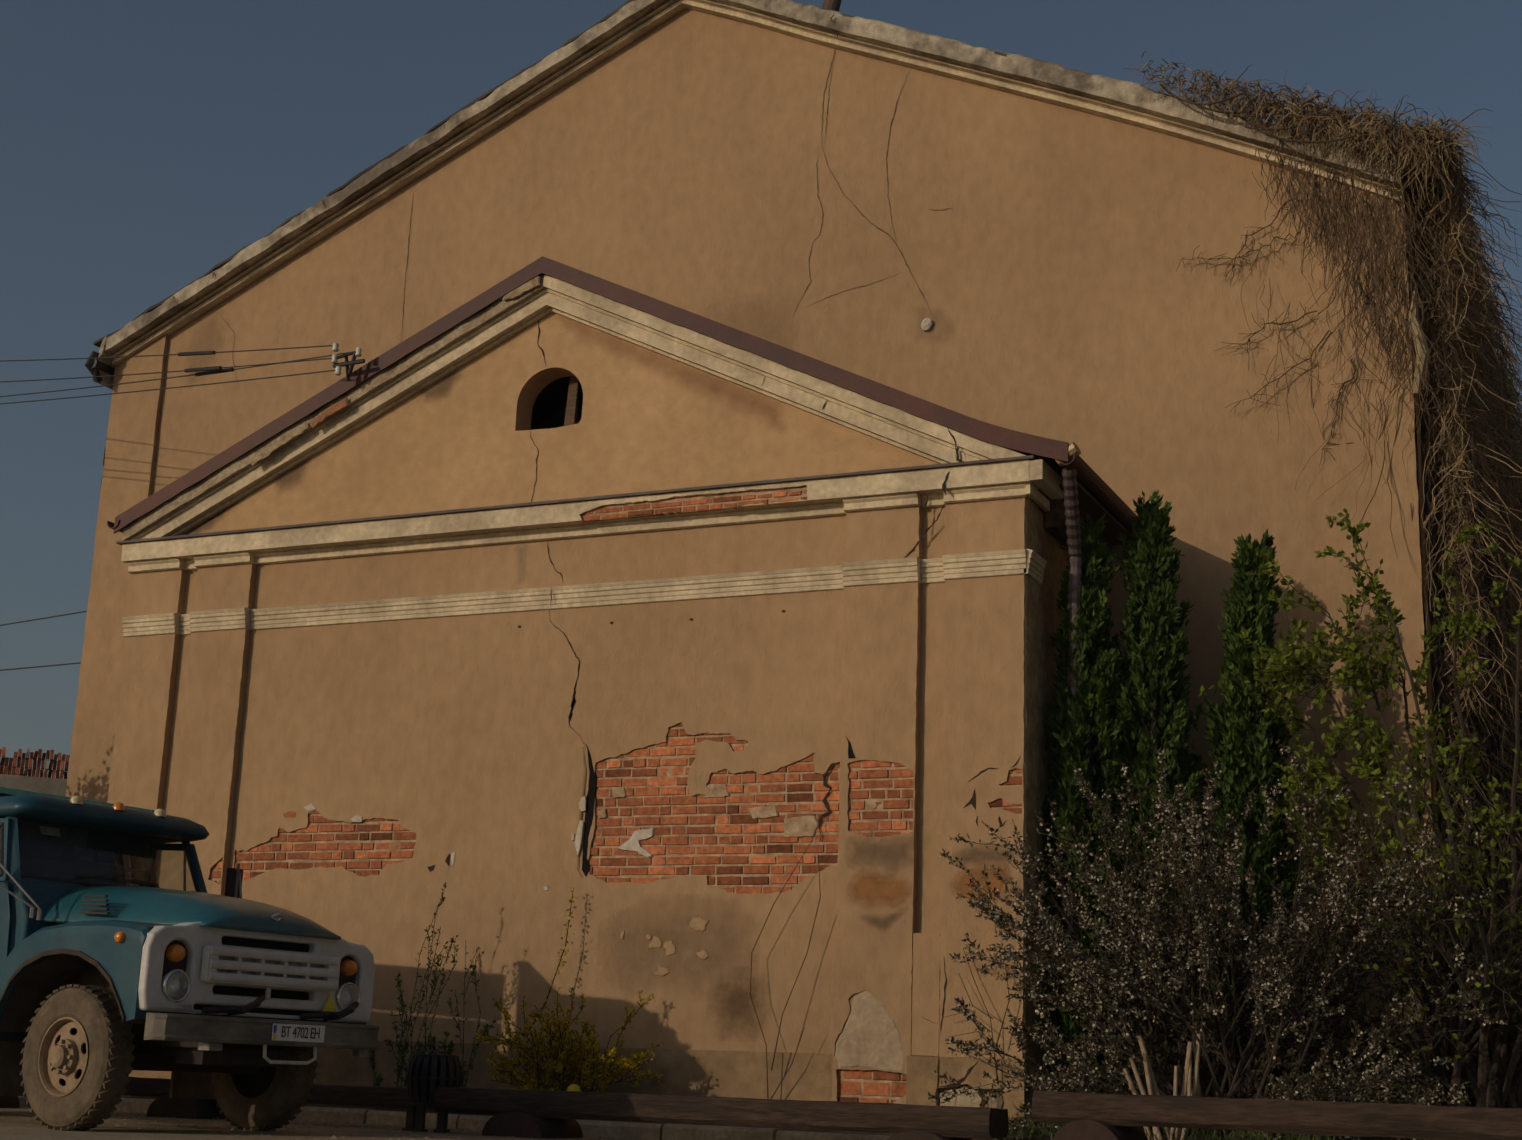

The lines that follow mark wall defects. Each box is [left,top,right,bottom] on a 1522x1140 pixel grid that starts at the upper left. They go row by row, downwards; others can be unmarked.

crack [790,14,933,328]
crack [537,320,546,364]
flaking render [581,485,807,523]
crack [904,429,963,558]
crack [547,541,597,878]
flaking render [210,804,455,884]
flaking render [589,723,914,894]
flaking render [964,768,1022,814]
peeling [834,990,906,1104]